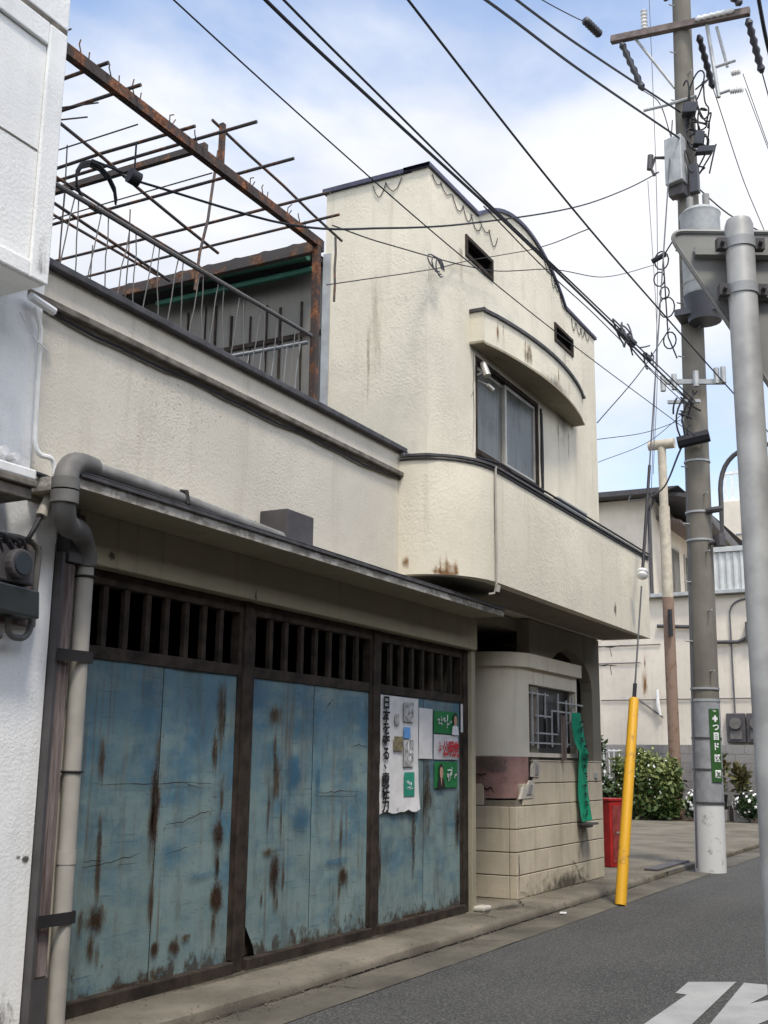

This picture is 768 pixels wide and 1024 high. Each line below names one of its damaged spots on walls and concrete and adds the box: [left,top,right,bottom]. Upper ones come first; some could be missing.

corrosion [213,688,226,770]
corrosion [79,821,104,959]
crack [83,782,213,868]
corrosion [149,745,160,845]
corrosion [210,790,223,935]
corrosion [261,739,284,909]
corrosion [339,822,348,892]
corrosion [412,764,431,863]
corrosion [107,934,190,991]